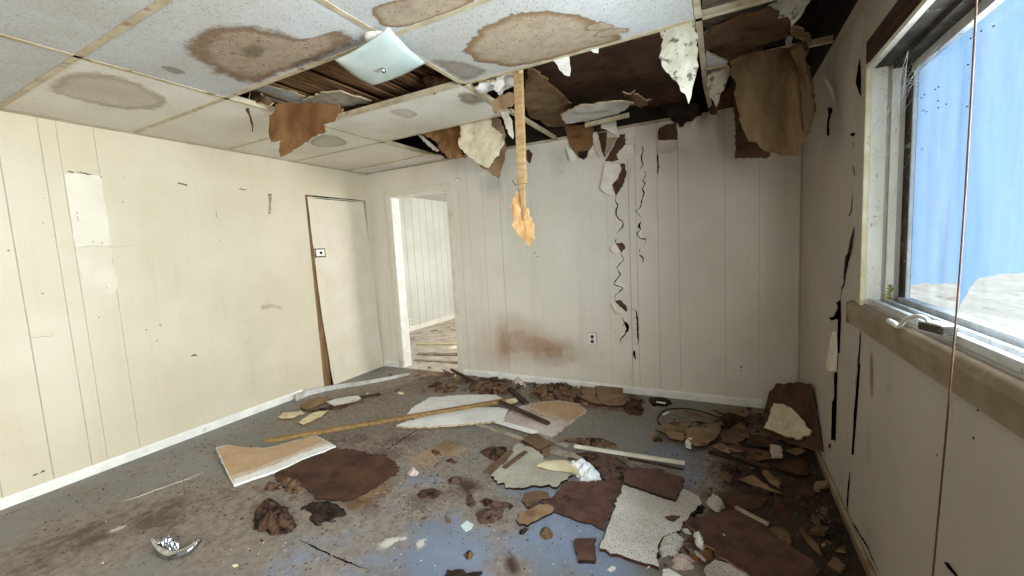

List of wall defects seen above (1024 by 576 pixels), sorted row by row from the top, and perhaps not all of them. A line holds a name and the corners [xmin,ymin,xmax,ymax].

leakage [187,26,352,82]
leakage [372,0,474,27]
leakage [439,11,630,79]
peeling [553,56,571,76]
spalling [564,117,635,196]
spalling [657,123,679,174]
crack [610,146,650,382]
crack [826,203,879,574]